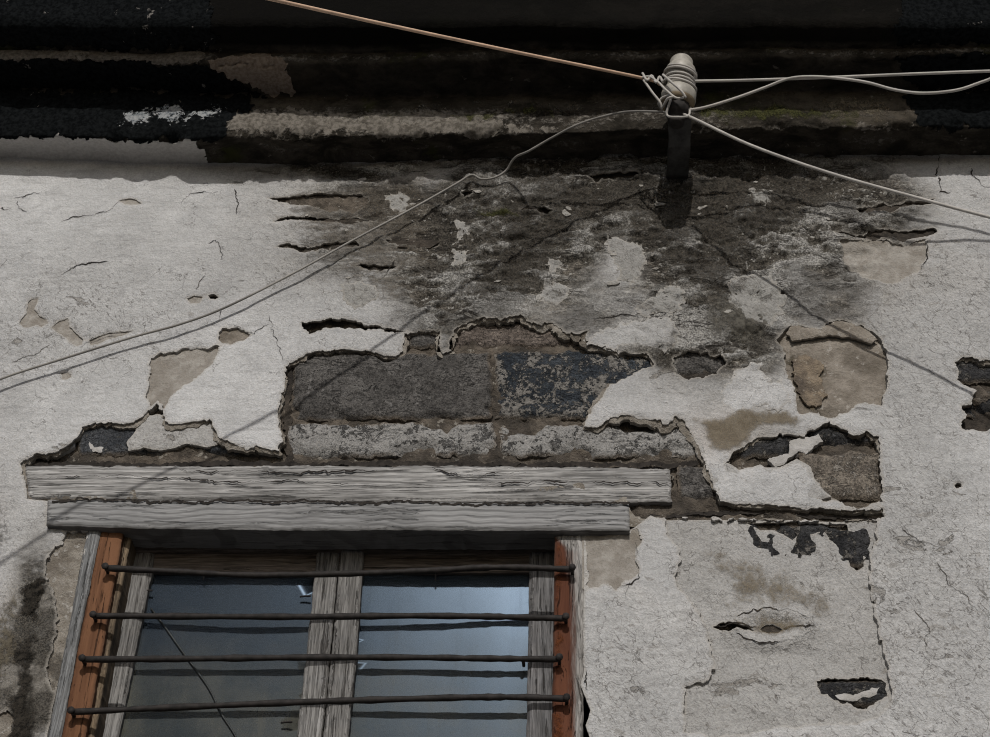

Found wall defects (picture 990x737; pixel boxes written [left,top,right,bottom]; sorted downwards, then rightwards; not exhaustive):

flaking render [384,191,420,214]
flaking render [747,181,774,208]
flaking render [337,265,394,310]
flaking render [451,220,476,266]
flaking render [536,258,571,306]
flaking render [604,233,660,286]
damp [707,296,768,347]
flaking render [724,273,787,328]
flaking render [956,358,990,431]
flaking render [20,285,892,737]
damp [0,578,47,737]